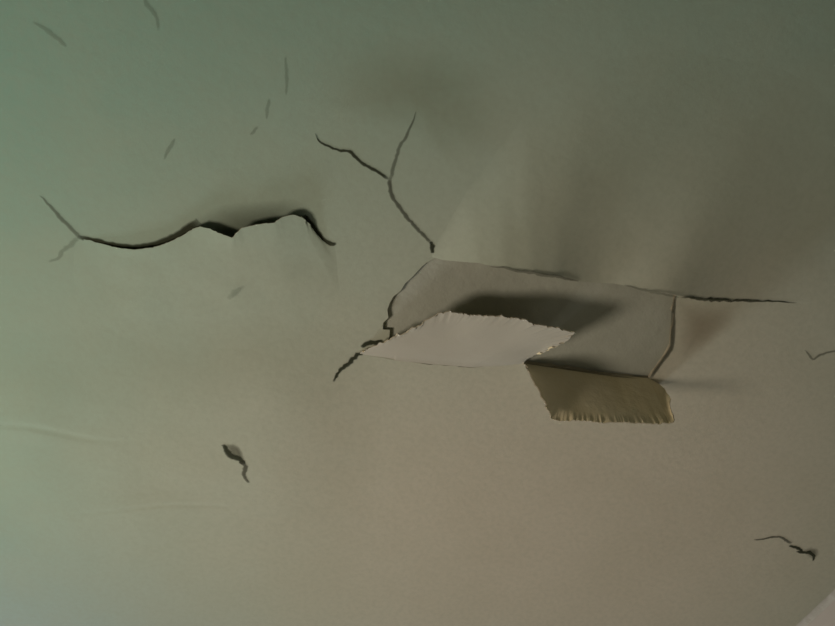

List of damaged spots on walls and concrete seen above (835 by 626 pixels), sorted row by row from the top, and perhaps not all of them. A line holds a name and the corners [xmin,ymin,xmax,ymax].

crack [316,136,435,253]
peeling [333,50,835,425]
crack [756,536,815,560]